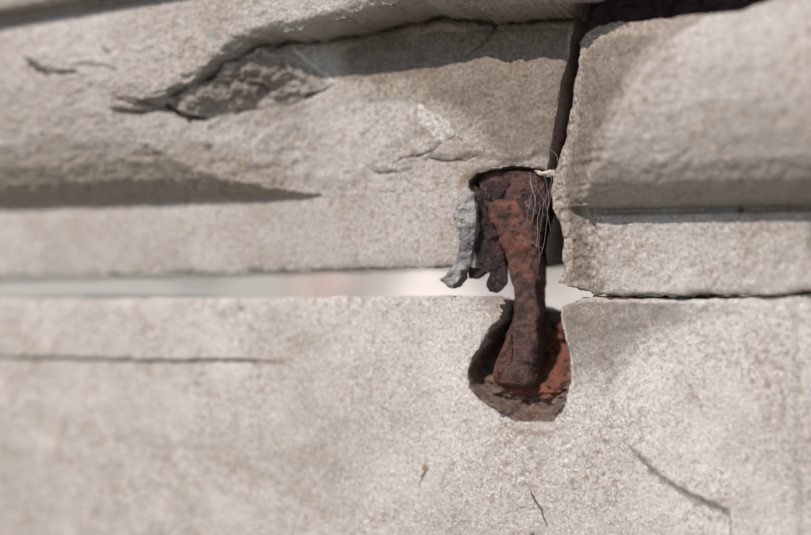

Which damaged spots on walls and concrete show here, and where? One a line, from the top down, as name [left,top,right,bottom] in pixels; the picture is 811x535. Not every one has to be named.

crack [248,11,573,58]
crack [23,45,118,77]
spalling [110,48,421,186]
rust [458,166,544,192]
rust [516,188,543,220]
rust [468,306,571,421]